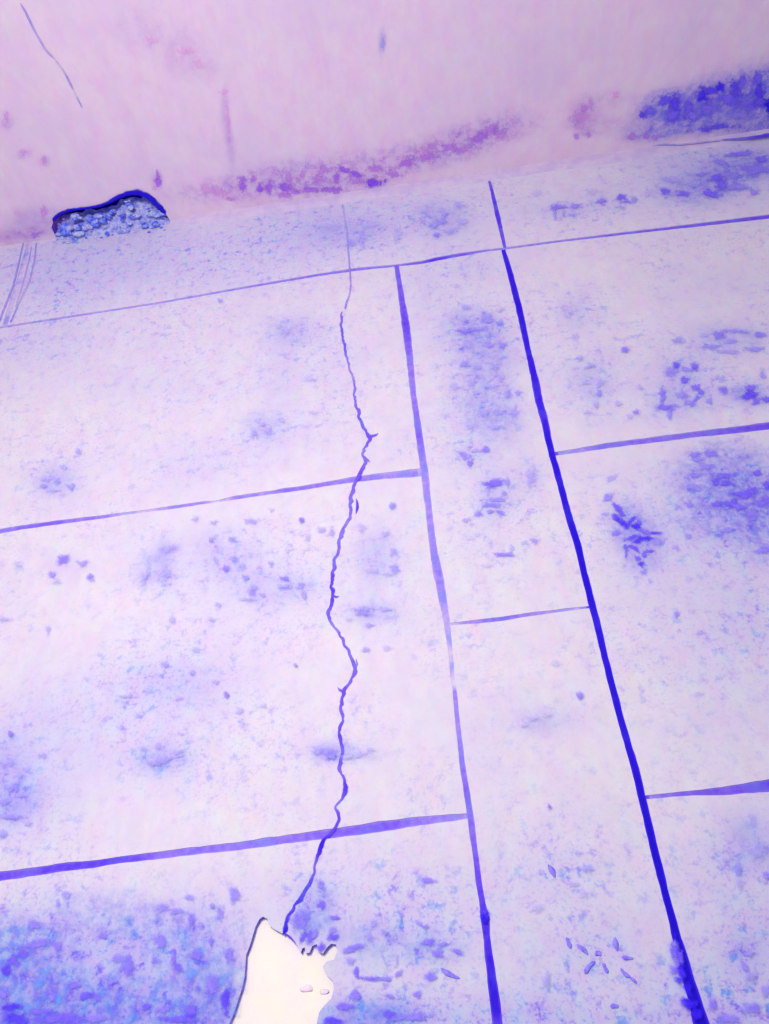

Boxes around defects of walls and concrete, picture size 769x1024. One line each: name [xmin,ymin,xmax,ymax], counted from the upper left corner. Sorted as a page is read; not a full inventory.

leakage [629,71,769,141]
leakage [217,125,505,201]
spalling [52,190,170,244]
crack [283,204,378,946]